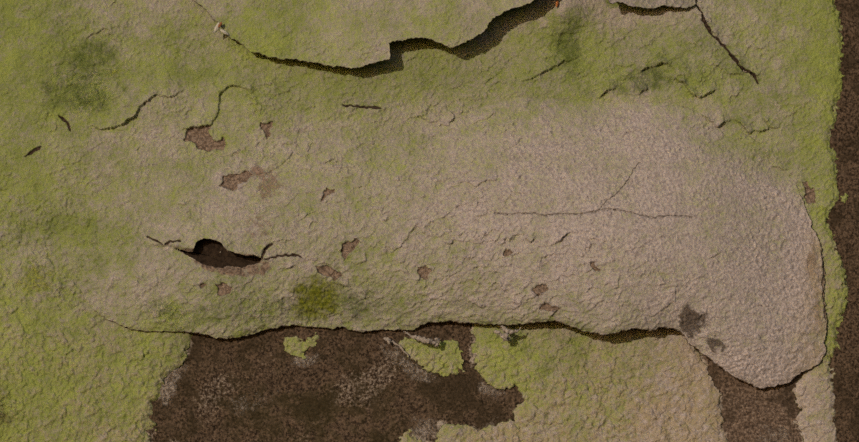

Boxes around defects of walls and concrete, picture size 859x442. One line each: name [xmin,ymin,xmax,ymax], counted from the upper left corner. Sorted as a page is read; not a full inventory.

crack [696,6,759,84]
spalling [145,323,523,442]
damp [706,338,725,353]
spalling [694,349,804,442]